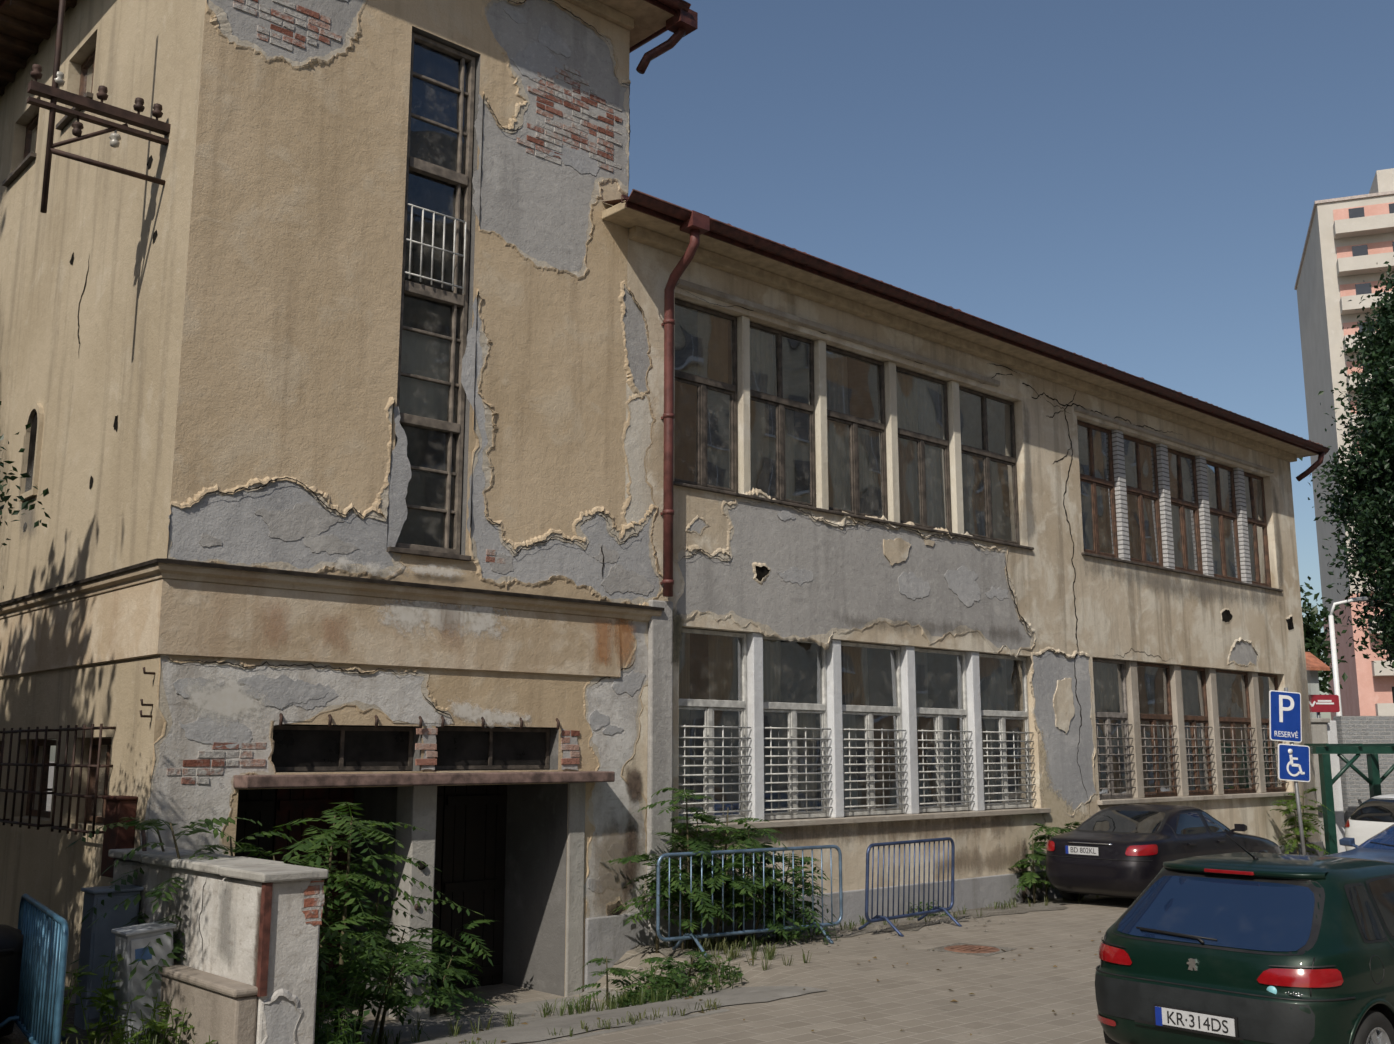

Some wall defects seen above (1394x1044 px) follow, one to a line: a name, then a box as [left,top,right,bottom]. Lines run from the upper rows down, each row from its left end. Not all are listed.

flaking render [205,0,368,71]
flaking render [472,0,631,281]
flaking render [140,280,1098,927]
crack [1032,392,1186,817]
flaking render [1220,608,1258,667]
flaking render [261,988,304,1044]